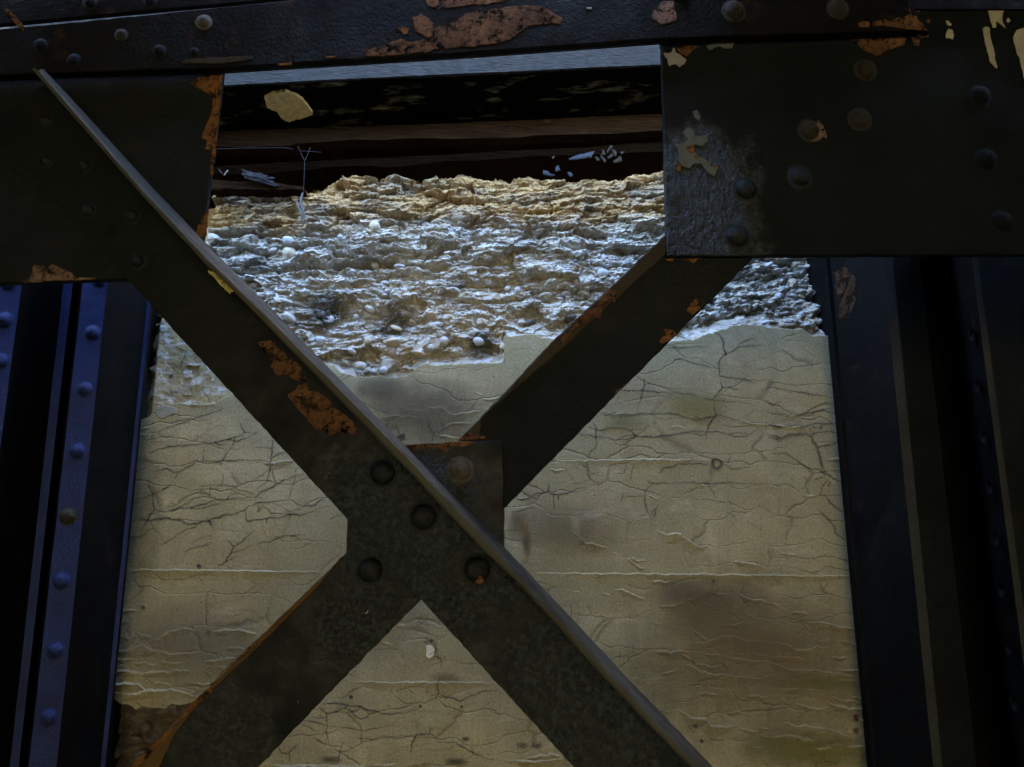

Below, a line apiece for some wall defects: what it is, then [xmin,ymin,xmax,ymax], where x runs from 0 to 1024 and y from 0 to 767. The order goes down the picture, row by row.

corrosion [363,0,562,57]
corrosion [652,1,677,25]
corrosion [850,7,930,56]
corrosion [190,74,222,176]
peeling [674,110,717,177]
corrosion [23,264,96,283]
spalling [207,171,665,378]
spalling [670,258,825,342]
corrosion [258,341,359,436]
crack [516,333,846,540]
crack [130,411,340,565]
crack [278,618,497,765]